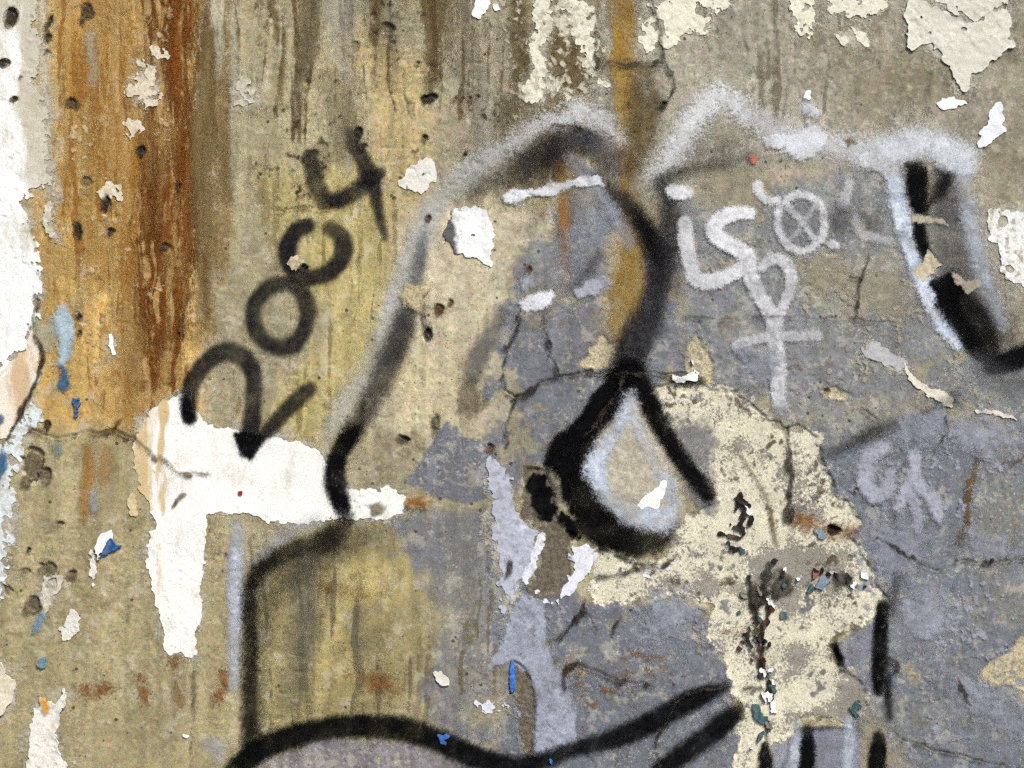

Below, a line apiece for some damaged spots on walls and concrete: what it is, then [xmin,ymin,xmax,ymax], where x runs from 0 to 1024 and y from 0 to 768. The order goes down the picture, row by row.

damp [369,0,446,111]
damp [457,0,531,120]
damp [548,30,586,89]
peeling [786,0,1023,110]
peeling [0,0,83,602]
rust [42,223,62,288]
rust [61,0,208,409]
rust [608,0,648,308]
crack [7,294,208,508]
crack [501,311,688,447]
spalling [506,332,913,768]
peeling [0,661,77,768]